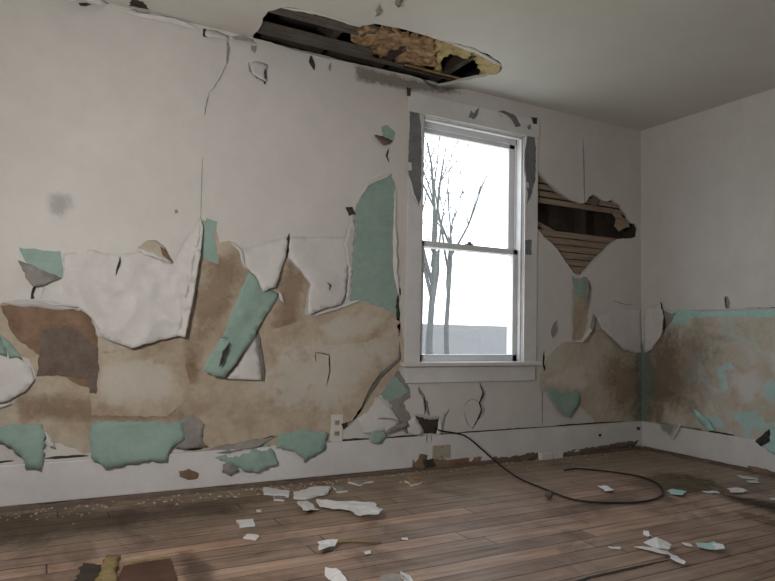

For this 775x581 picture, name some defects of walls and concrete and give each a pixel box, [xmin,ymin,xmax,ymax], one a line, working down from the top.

peeling [67,0,268,84]
spalling [281,7,361,27]
crack [375,0,403,16]
crack [205,40,230,113]
peeling [498,110,775,454]
peeling [0,173,443,476]
crack [418,384,625,434]
crack [45,453,88,461]
peeling [179,469,199,480]
crack [328,436,369,444]